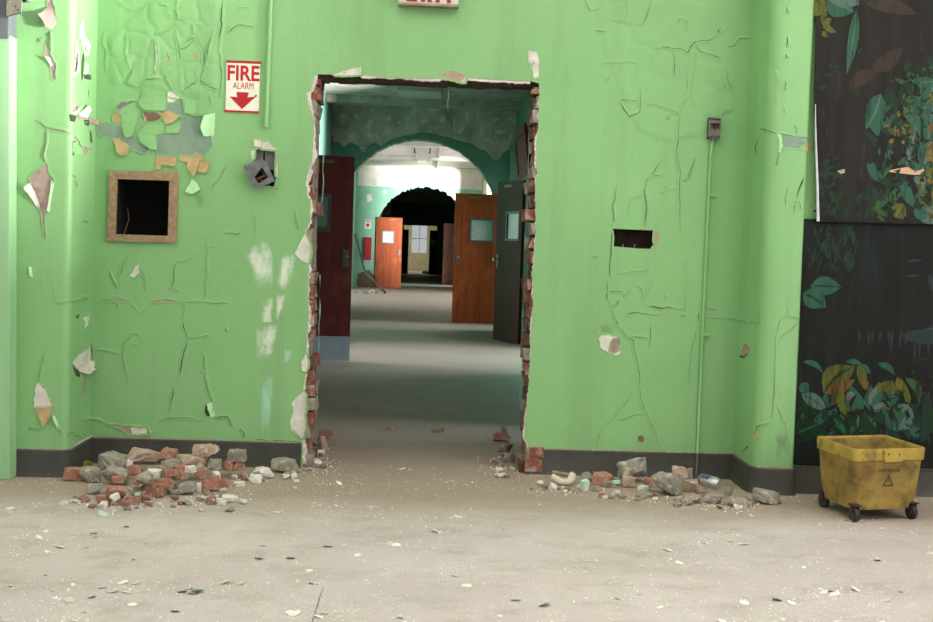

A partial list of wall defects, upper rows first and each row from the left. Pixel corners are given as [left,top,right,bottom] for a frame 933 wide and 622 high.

peeling [38,0,58,29]
crack [99,0,255,108]
crack [582,0,752,90]
peeling [23,162,55,239]
peeling [68,89,215,194]
flaking render [293,232,313,265]
peeling [357,165,483,203]
crack [603,87,698,449]
crack [156,317,247,439]
damp [244,238,297,440]
flaking render [288,390,309,440]
crack [742,302,799,457]